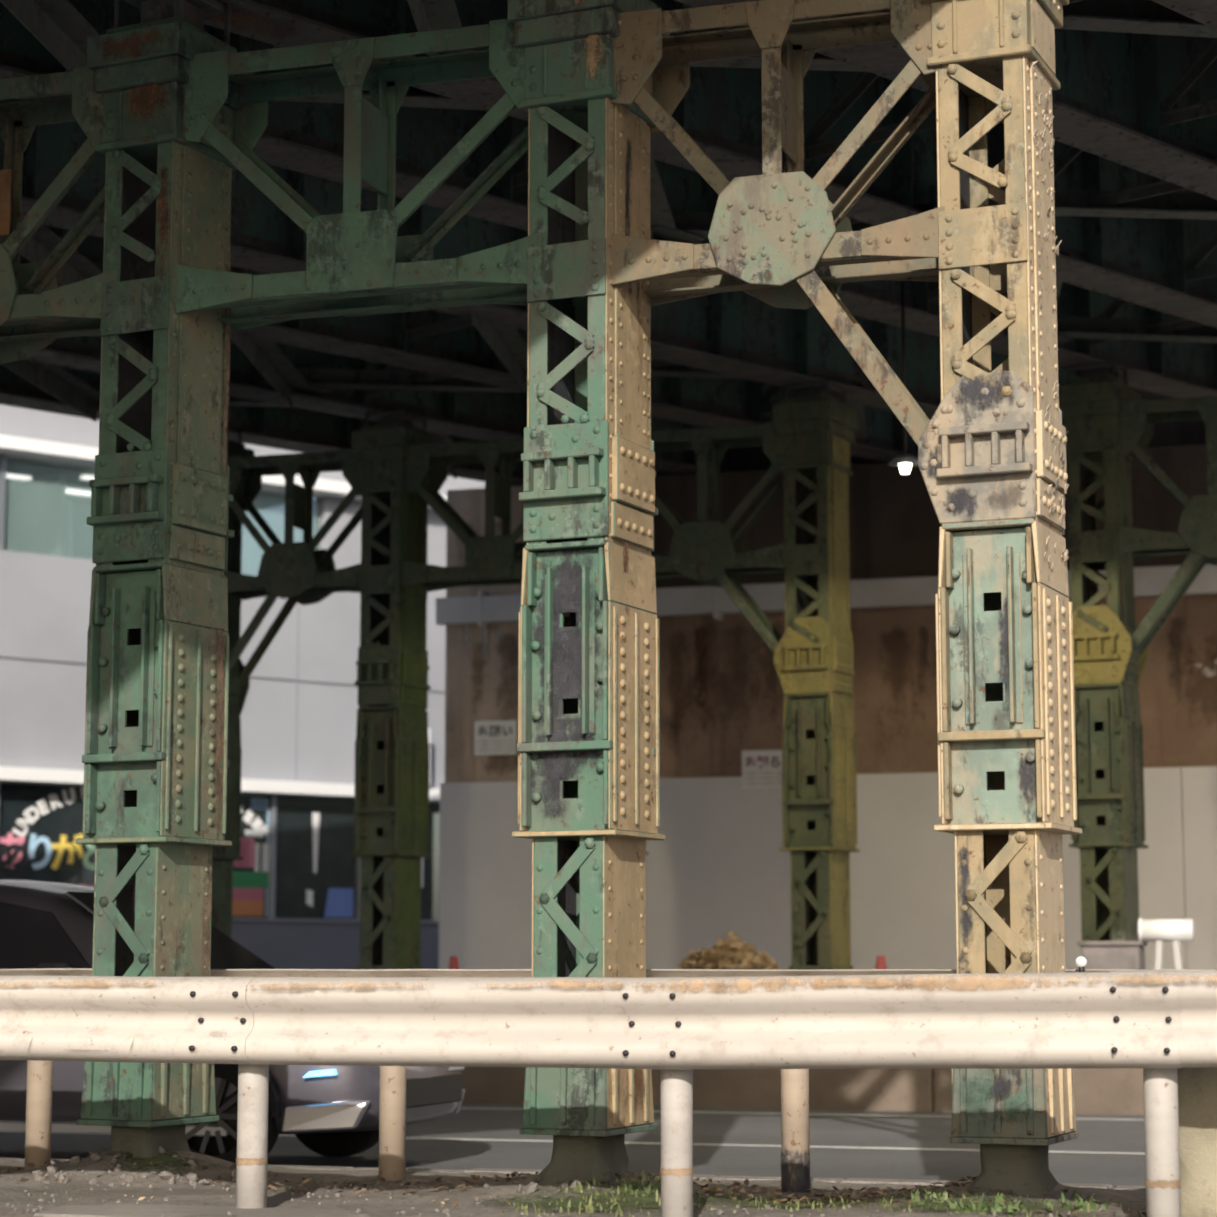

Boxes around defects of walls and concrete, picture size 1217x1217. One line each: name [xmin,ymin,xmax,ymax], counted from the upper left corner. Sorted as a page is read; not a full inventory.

corrosion [585,34,603,76]
peeling [958,372,1013,410]
peeling [928,447,942,477]
peeling [947,488,976,516]
damp [1000,598,1009,708]
damp [531,540,599,817]
damp [1019,758,1037,801]
damp [958,847,973,974]